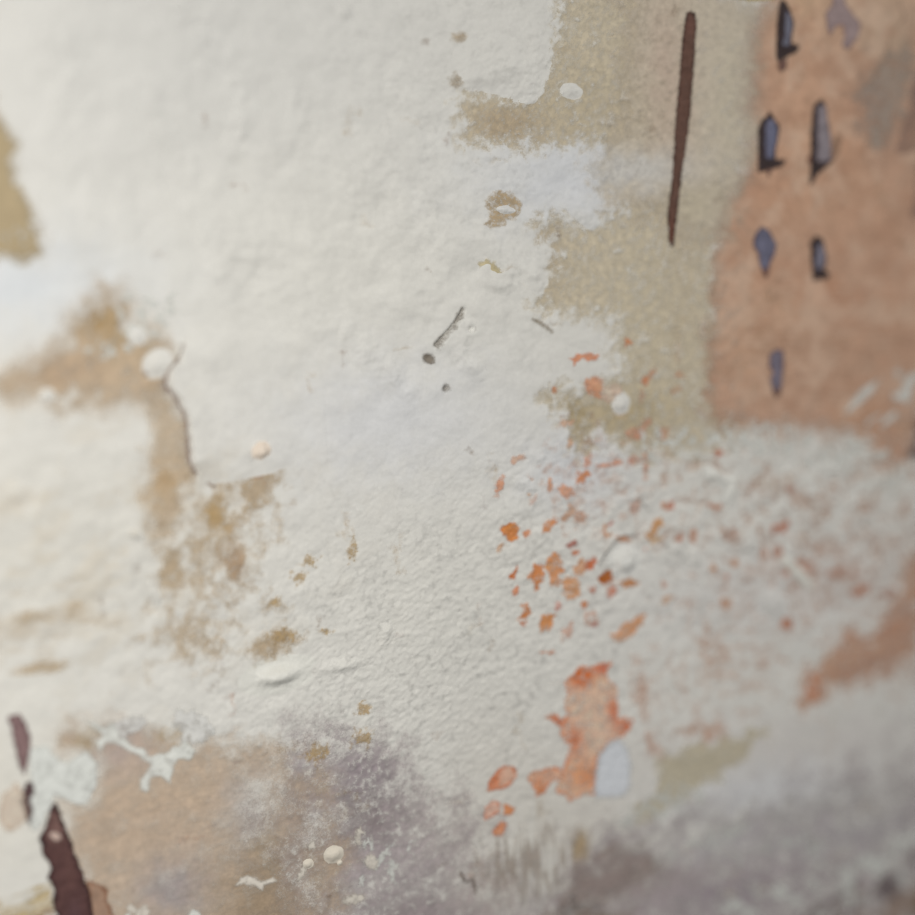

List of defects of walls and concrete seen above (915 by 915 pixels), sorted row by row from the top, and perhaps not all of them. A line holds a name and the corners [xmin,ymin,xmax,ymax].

peeling [0,119,42,265]
crack [144,343,215,488]